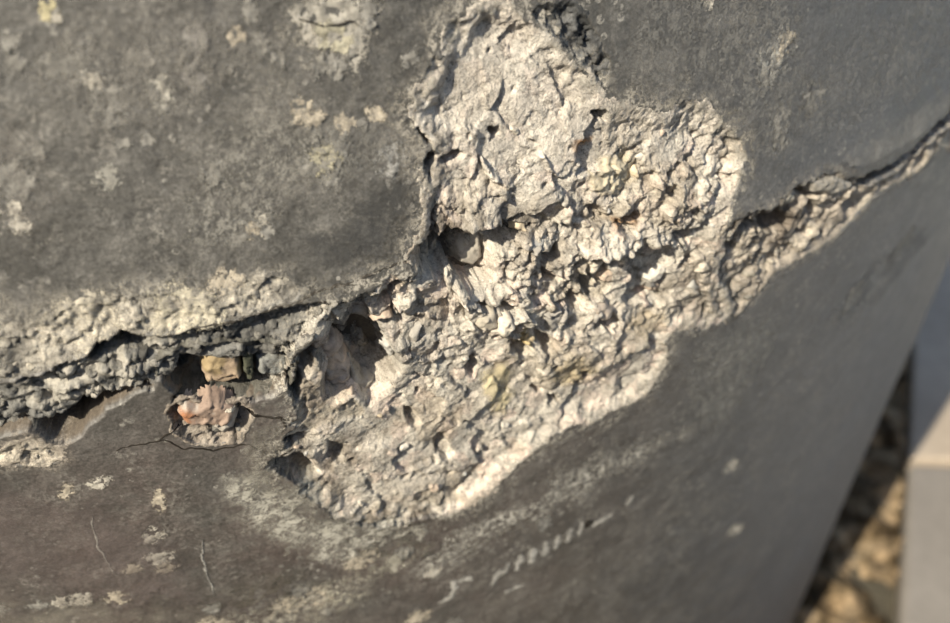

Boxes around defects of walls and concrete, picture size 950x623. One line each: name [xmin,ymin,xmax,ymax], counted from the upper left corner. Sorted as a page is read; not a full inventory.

peeling [0,0,383,151]
peeling [0,141,47,236]
peeling [90,160,124,193]
spalling [151,0,950,532]
spalling [0,264,298,386]
spalling [0,406,73,470]
crack [117,403,294,474]
peeling [57,475,113,501]
peeling [120,526,180,575]
peeling [343,546,415,573]
peeling [422,565,443,578]
peeling [405,610,431,623]